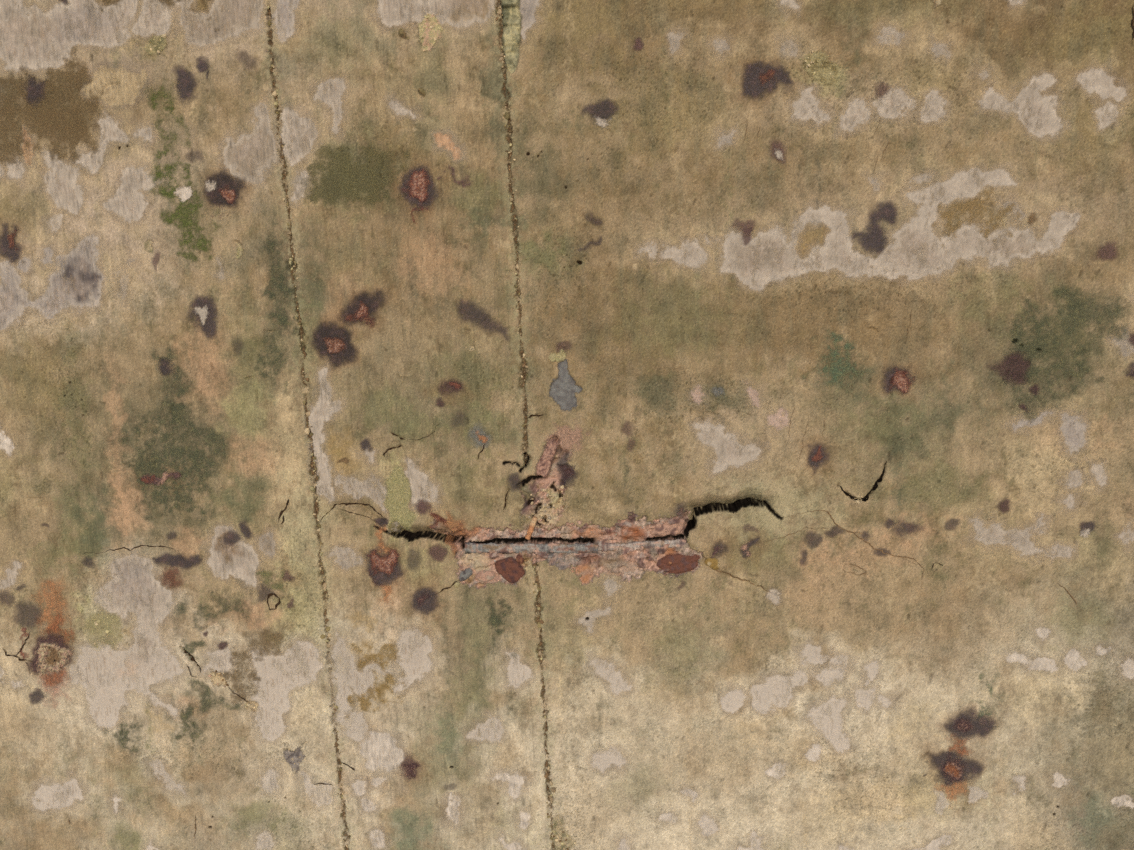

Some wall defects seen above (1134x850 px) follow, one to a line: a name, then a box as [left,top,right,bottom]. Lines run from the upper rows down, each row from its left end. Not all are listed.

rust [205,173,243,206]
rust [400,167,470,221]
rust [314,291,383,366]
spalling [549,350,582,411]
crack [383,424,439,458]
crack [321,503,594,548]
crack [478,444,542,511]
spalling [304,362,719,634]
crack [646,461,942,592]
rust [367,527,403,601]
rust [20,581,71,706]
rust [932,709,995,799]